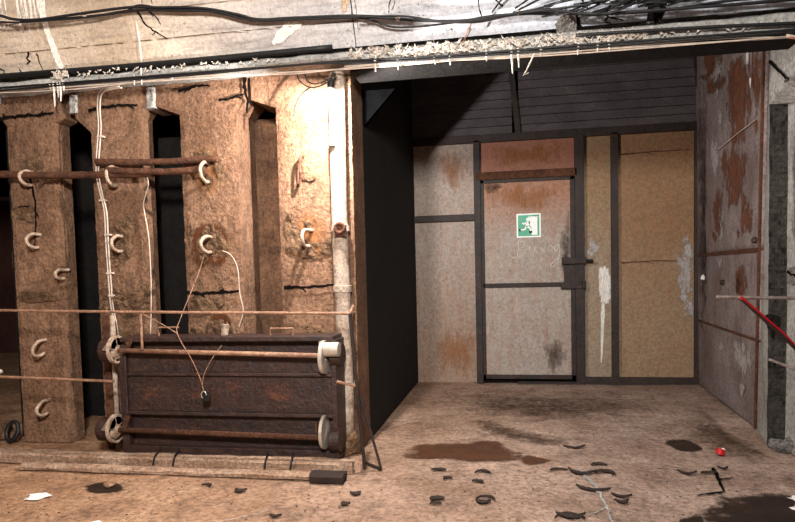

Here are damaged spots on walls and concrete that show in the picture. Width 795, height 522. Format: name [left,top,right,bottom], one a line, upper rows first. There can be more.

spalling [111,213,135,267]
spalling [184,222,230,265]
spalling [98,284,153,319]
spalling [189,296,234,334]
water stain [404,424,561,465]
water stain [679,493,795,522]